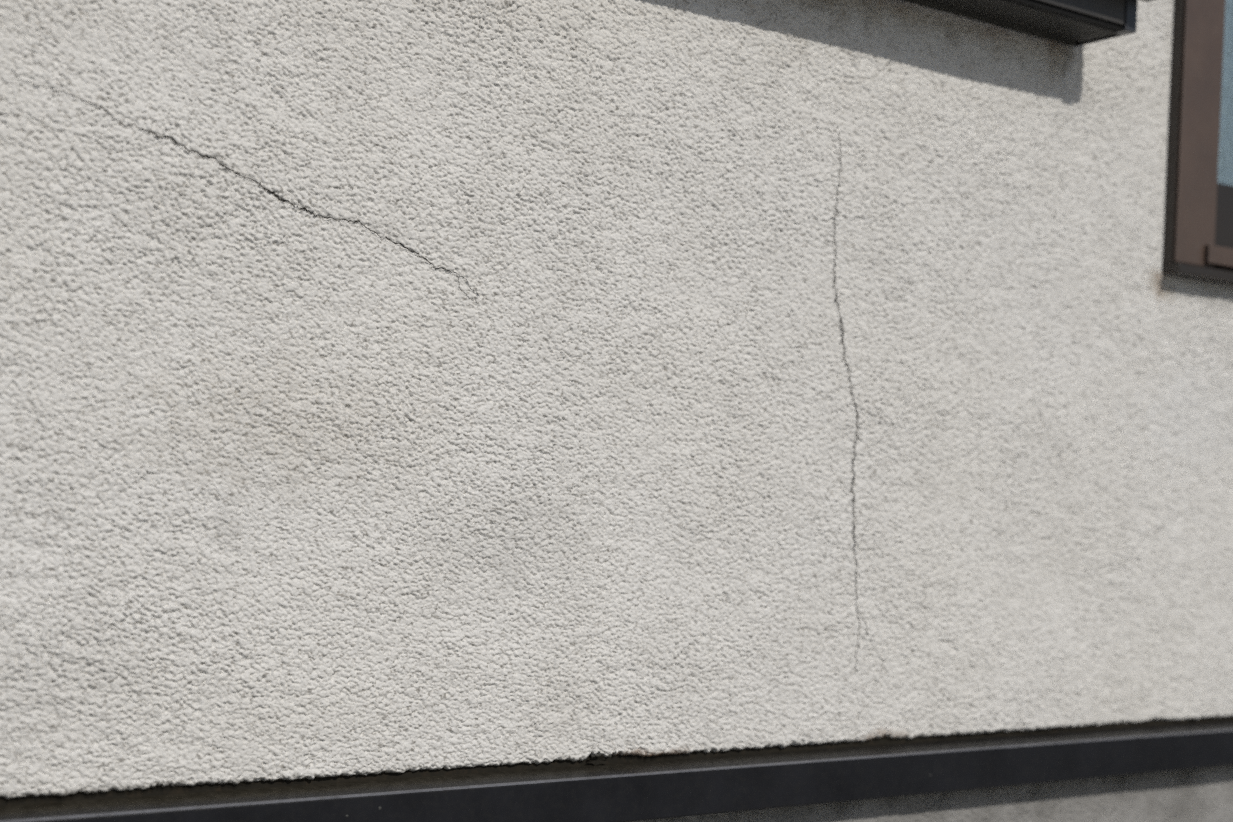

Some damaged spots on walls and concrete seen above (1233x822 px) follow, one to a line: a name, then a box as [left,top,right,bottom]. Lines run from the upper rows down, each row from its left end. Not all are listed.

crack [12,69,479,301]
crack [833,135,868,673]